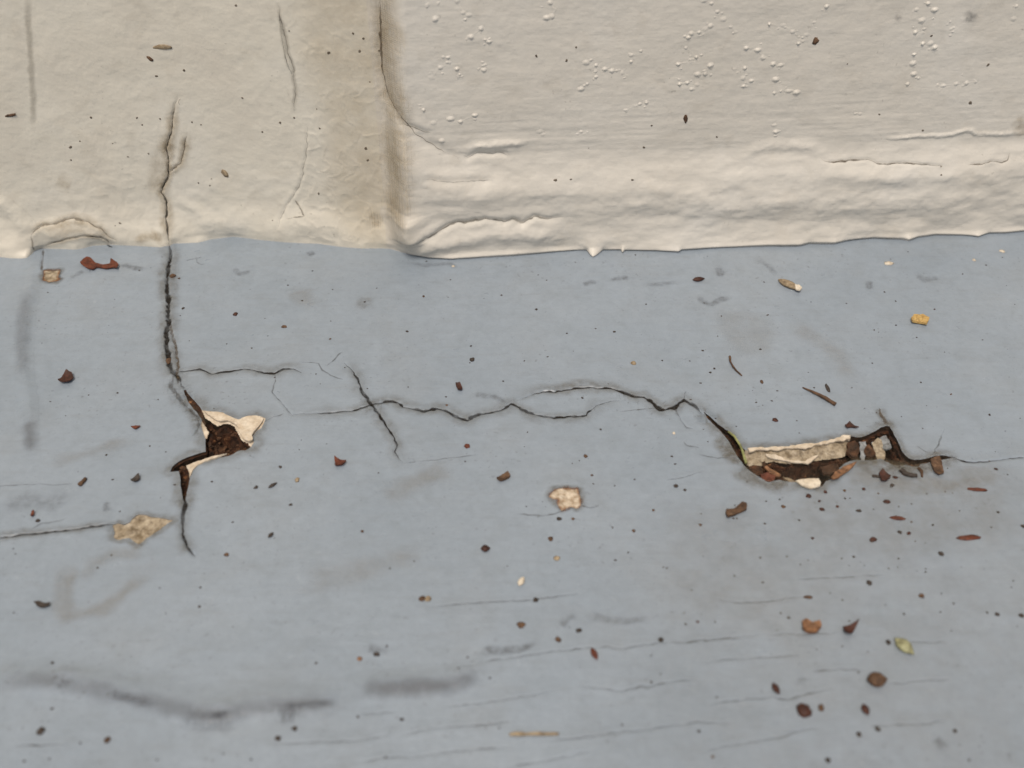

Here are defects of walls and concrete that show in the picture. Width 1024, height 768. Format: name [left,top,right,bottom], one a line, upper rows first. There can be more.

crack [161,108,295,380]
crack [425,216,543,239]
spalling [170,390,265,501]
crack [319,371,697,457]
spalling [704,412,951,487]
peeling [112,514,173,545]
crack [182,500,192,554]
peeling [549,487,582,511]